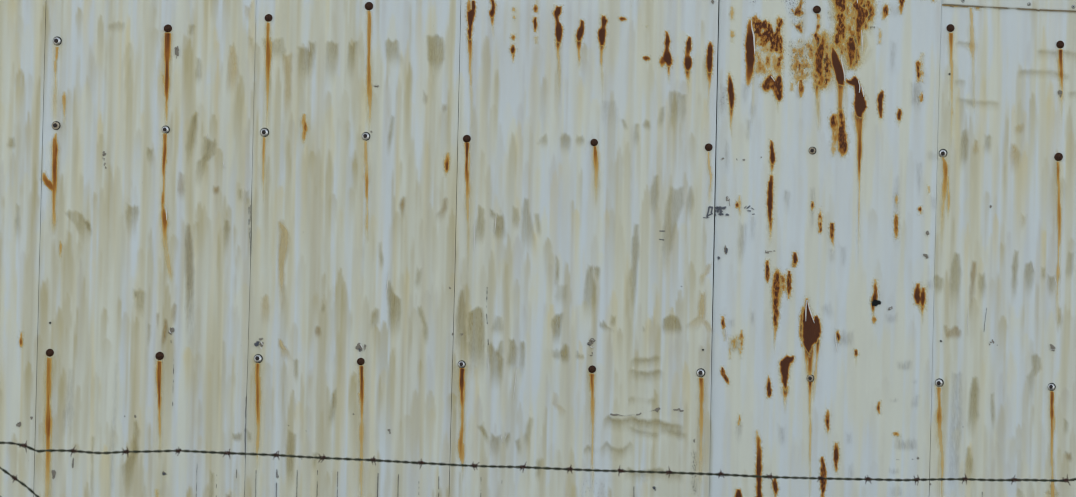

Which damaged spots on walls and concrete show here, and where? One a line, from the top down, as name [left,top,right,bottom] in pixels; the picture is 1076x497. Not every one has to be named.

corrosion [163,32,171,117]
corrosion [553,6,563,56]
corrosion [598,15,627,64]
corrosion [643,31,692,79]
corrosion [727,73,735,125]
corrosion [731,0,905,193]
corrosion [42,134,58,224]
corrosion [767,140,775,232]
corrosion [765,252,798,338]
corrosion [914,283,926,313]
corrosion [766,298,839,497]
corrosion [755,432,779,497]